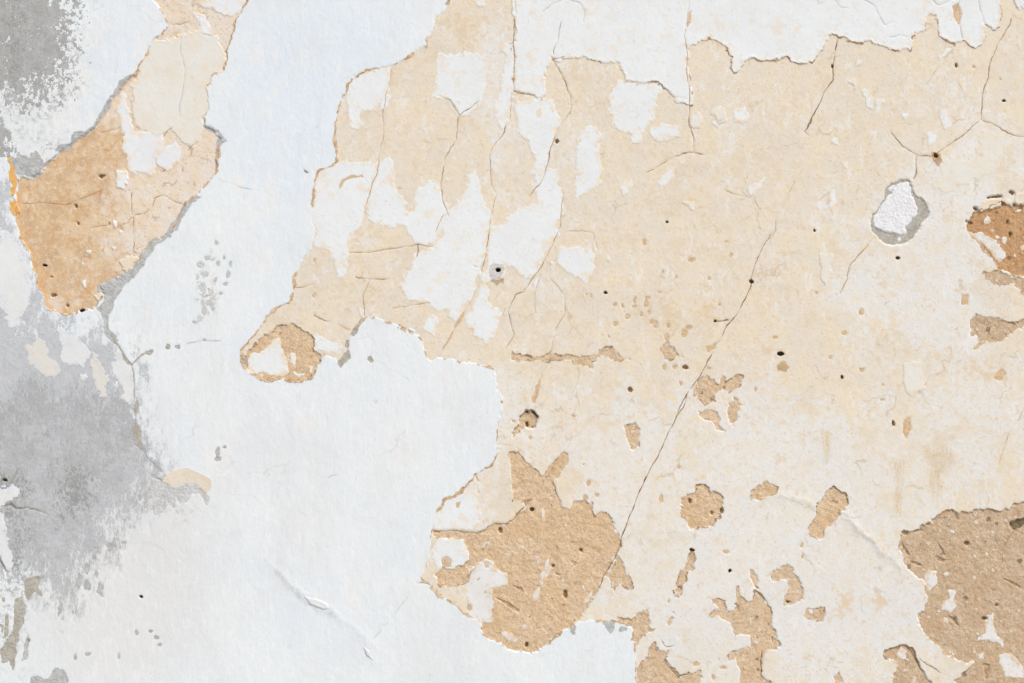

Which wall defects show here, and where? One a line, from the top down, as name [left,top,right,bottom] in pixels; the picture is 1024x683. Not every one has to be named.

peeling [0,0,249,405]
crack [364,68,392,214]
crack [317,99,478,330]
crack [439,3,531,356]
crack [505,200,597,400]
crack [531,0,586,194]
peeling [240,0,1024,683]
crack [628,8,702,172]
crack [586,190,776,610]
crack [805,39,838,133]
crack [840,240,873,293]
crack [890,0,1022,179]